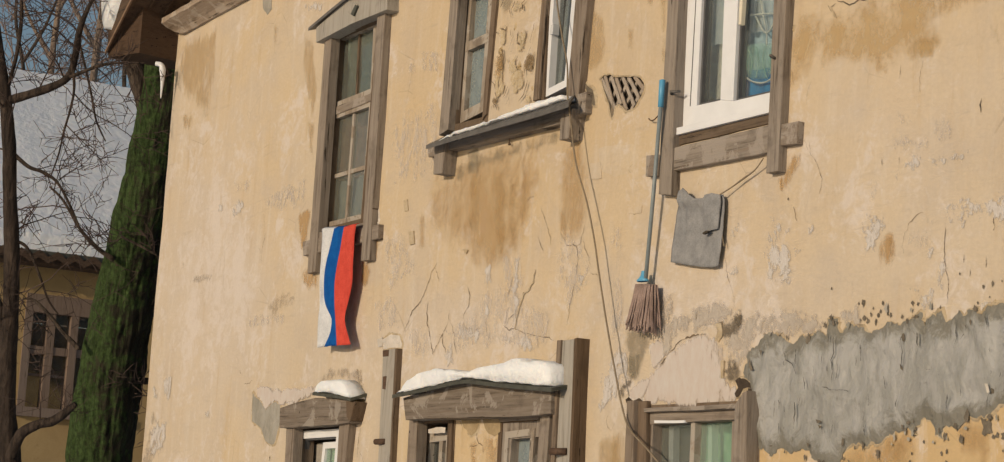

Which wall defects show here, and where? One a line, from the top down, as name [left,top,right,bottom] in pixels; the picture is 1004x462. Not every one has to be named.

crack [828,0,865,18]
crack [403,196,597,354]
flaking render [251,386,316,459]
flaking render [599,280,1004,462]